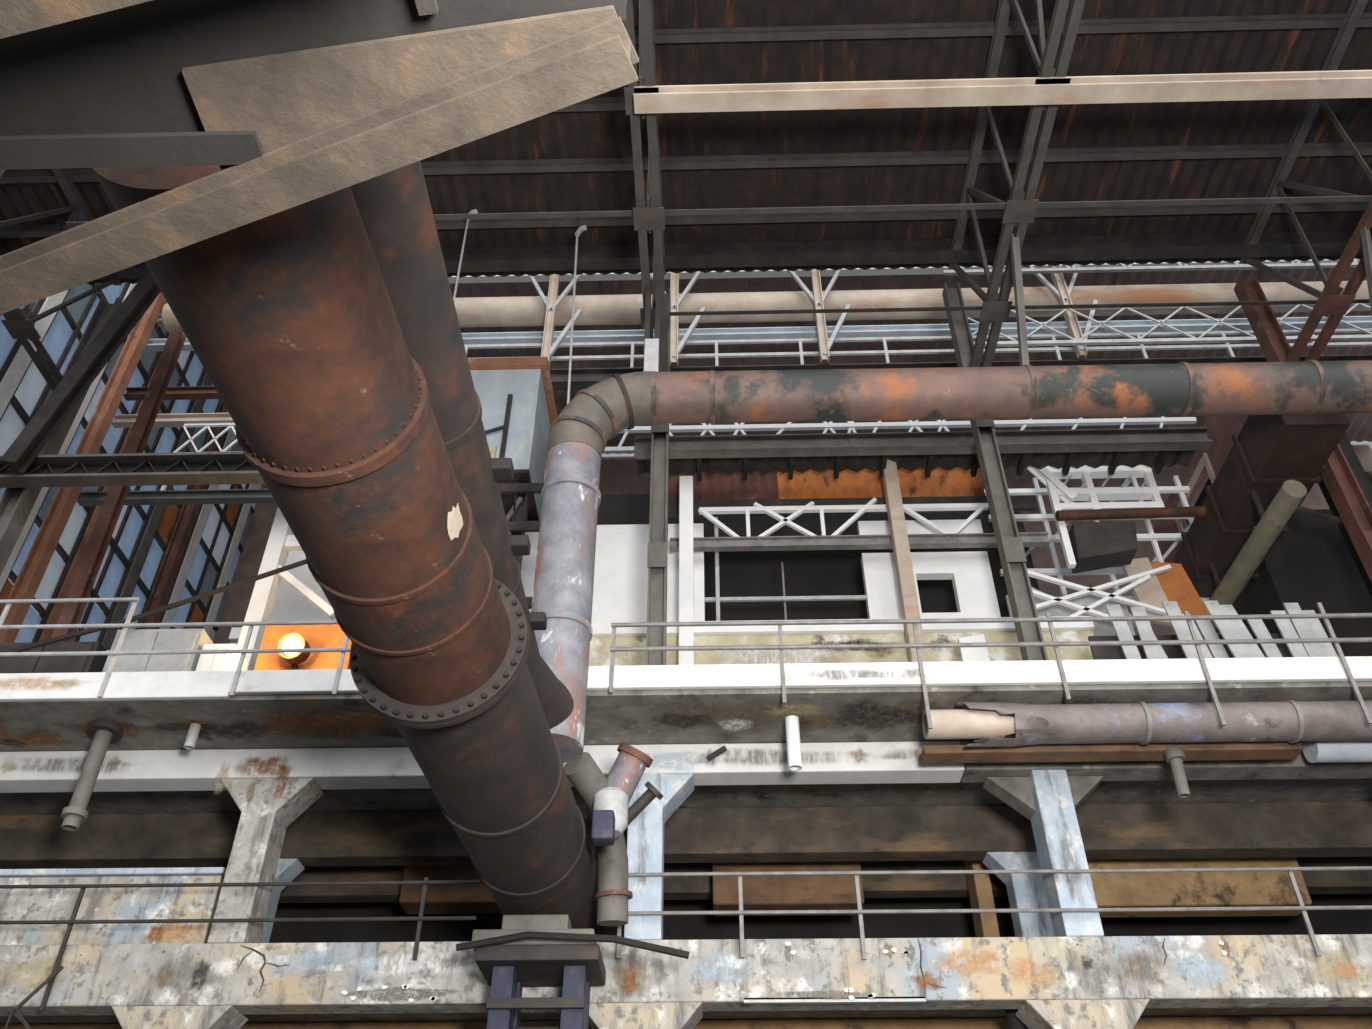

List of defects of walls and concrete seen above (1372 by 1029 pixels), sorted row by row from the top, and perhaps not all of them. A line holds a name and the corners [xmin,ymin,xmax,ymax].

corrosion [217,757,288,799]
corrosion [916,974,938,988]